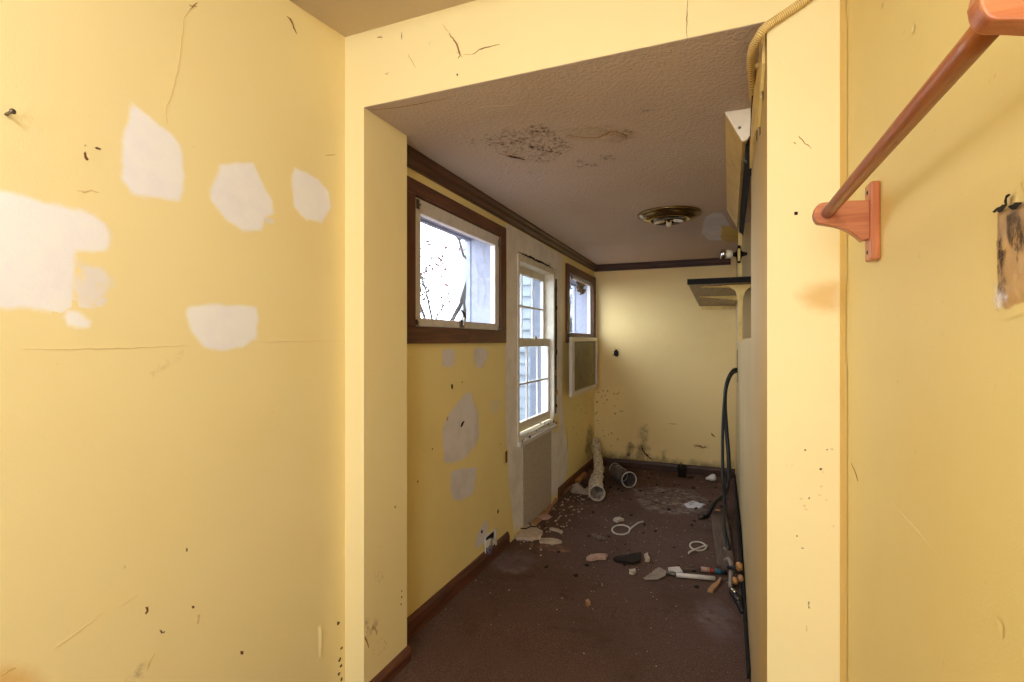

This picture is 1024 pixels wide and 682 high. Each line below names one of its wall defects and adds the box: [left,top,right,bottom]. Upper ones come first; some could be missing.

crack [444,27,500,58]
damp [448,110,606,172]
peeling [993,182,1024,319]
damp [584,390,653,464]